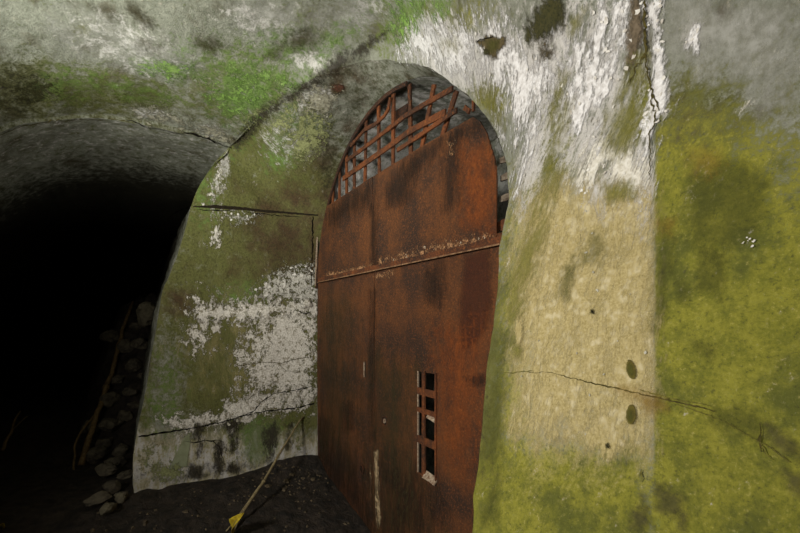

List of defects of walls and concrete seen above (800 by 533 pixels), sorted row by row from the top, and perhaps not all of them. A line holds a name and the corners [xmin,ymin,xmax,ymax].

crack [1,118,232,149]
leakage [523,0,577,61]
leakage [618,0,647,101]
crack [628,0,659,180]
crack [170,205,318,284]
peeling [393,0,671,461]
leakage [607,183,632,200]
peeling [152,257,318,439]
leakage [188,423,205,481]
crack [139,357,314,461]
leakage [213,417,244,474]
crack [504,370,789,462]